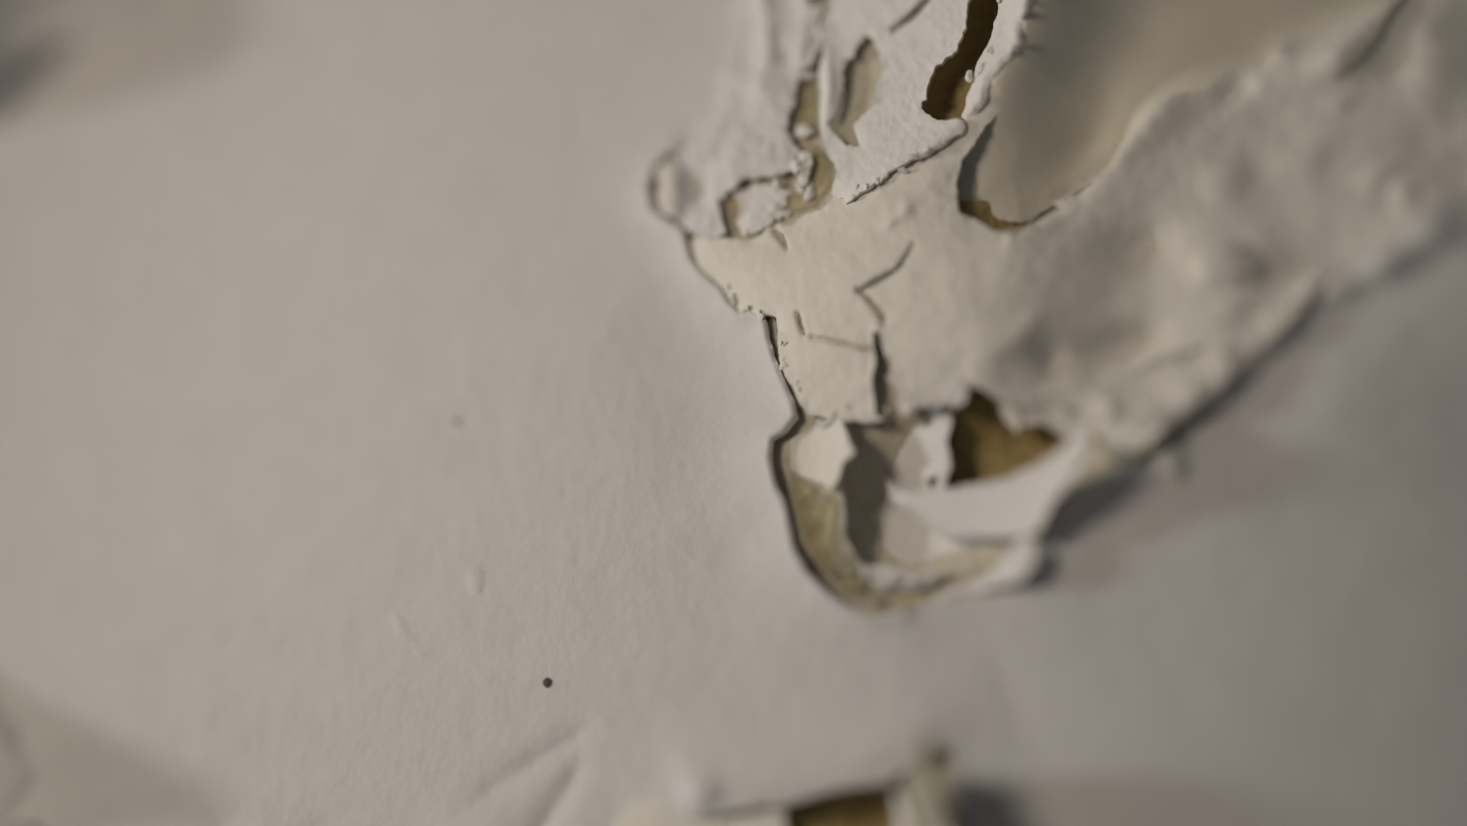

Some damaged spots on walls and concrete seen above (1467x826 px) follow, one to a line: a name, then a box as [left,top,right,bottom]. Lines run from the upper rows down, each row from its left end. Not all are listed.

crack [896,0,930,29]
crack [775,230,787,247]
peeling [655,0,1467,488]
crack [765,248,912,411]
peeling [608,737,949,826]